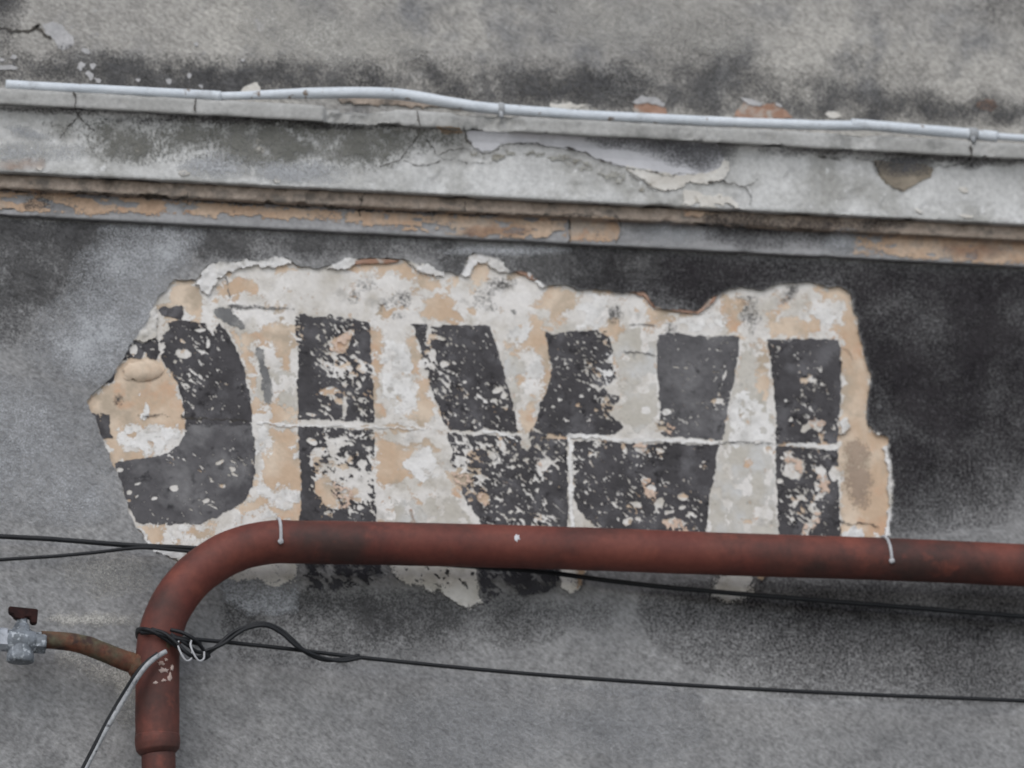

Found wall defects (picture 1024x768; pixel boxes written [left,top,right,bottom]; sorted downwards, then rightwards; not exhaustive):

leakage [0,0,1024,127]
spalling [633,95,667,114]
spalling [734,98,792,119]
peeling [436,126,739,218]
spalling [875,160,934,191]
peeling [0,188,620,242]
peeling [852,234,1024,265]
peeling [87,252,896,562]